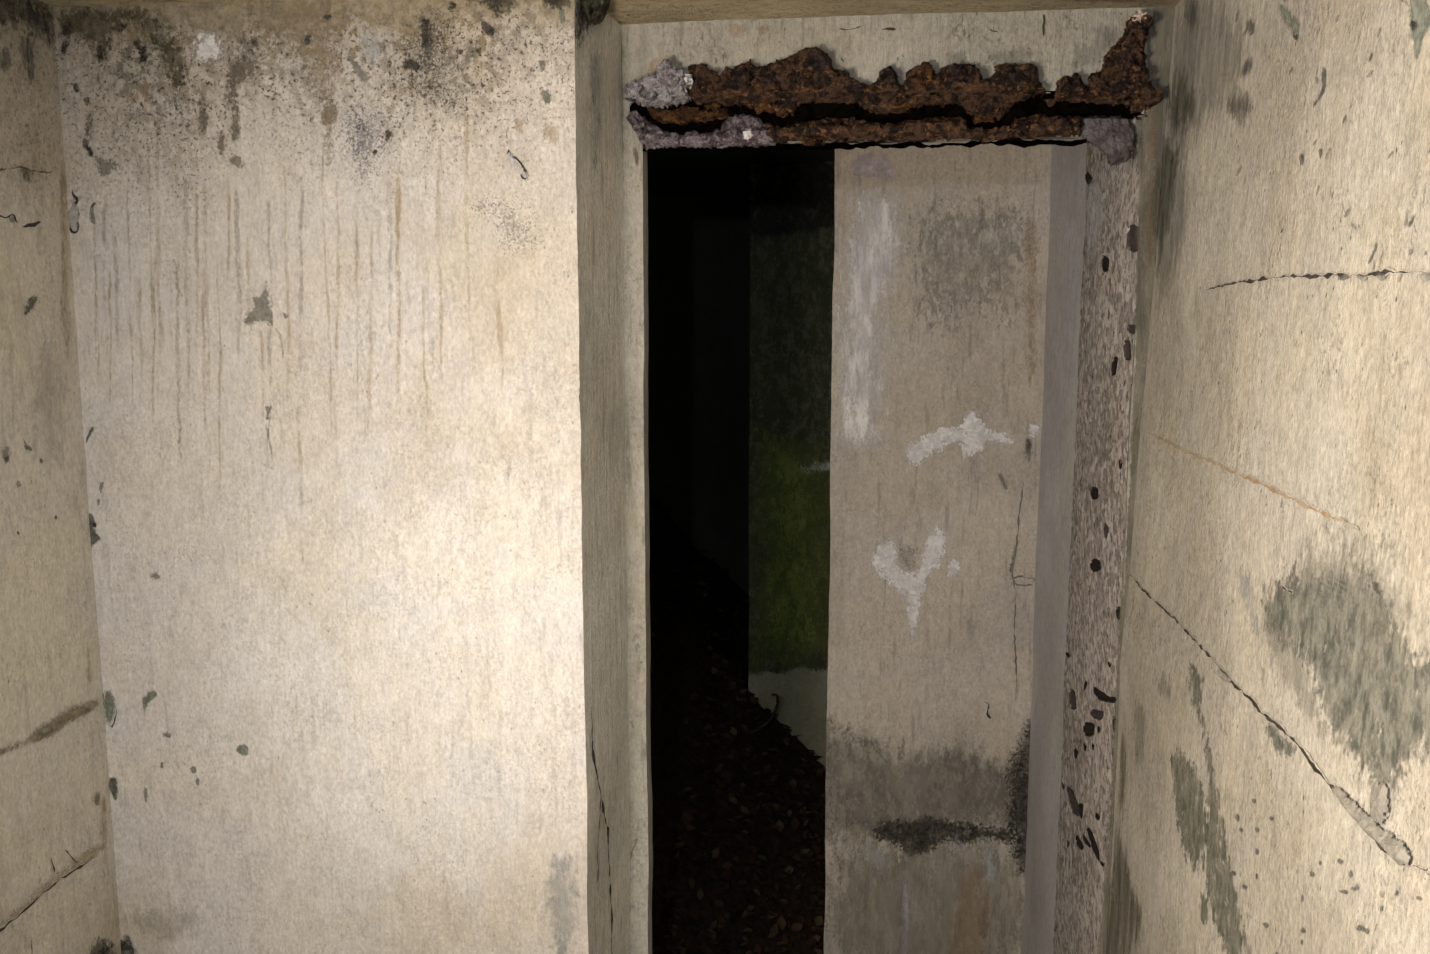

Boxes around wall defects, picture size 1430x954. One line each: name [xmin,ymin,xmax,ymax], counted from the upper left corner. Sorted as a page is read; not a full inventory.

leakage [542,0,597,46]
leakage [0,0,514,187]
leakage [621,59,693,109]
rust [803,47,832,74]
rust [630,62,1147,135]
crack [1207,267,1430,291]
leakage [906,411,1039,466]
leakage [1099,0,1254,954]
crack [1128,571,1342,792]
leakage [1242,542,1430,865]
leakage [825,718,1031,954]
crack [1370,837,1430,877]